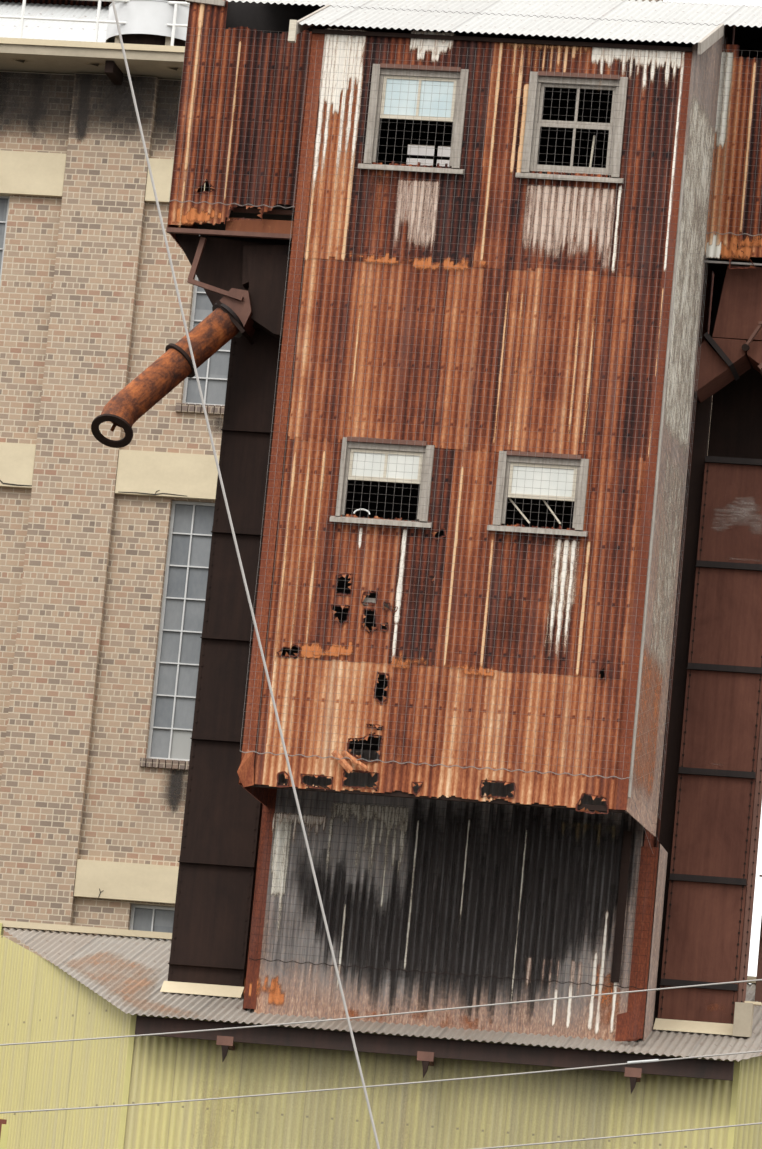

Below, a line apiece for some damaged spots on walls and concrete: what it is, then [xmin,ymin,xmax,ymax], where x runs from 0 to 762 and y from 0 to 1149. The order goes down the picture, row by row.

rust [176,3,241,226]
rust [341,43,503,270]
rust [510,56,529,173]
damp [612,185,622,271]
rust [274,451,353,660]
rust [443,466,494,677]
damp [169,770,187,808]
peeling [314,725,380,789]
peeling [271,803,409,929]
damp [319,868,367,989]
damp [381,820,615,1030]
damp [610,982,618,1033]